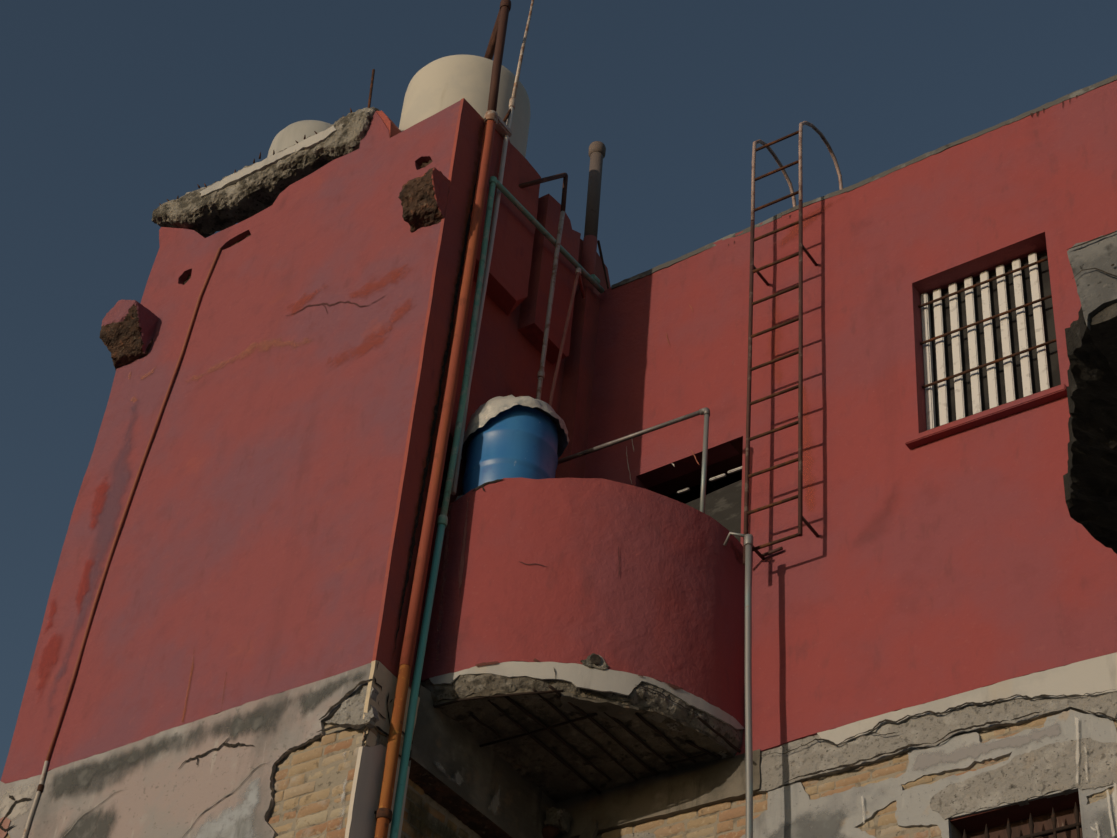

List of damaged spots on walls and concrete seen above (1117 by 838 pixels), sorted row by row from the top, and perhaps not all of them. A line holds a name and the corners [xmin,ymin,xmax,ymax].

crack [286,296,384,316]
crack [178,738,254,769]
flaking render [180,679,412,838]
spalling [433,685,741,803]
flaking render [781,713,1061,800]
leakage [1075,718,1087,783]
crack [0,795,31,832]
leakage [61,811,114,838]
flaking render [596,793,768,838]
leakage [769,811,844,838]
flaking render [858,802,942,838]
leakage [1091,783,1117,838]